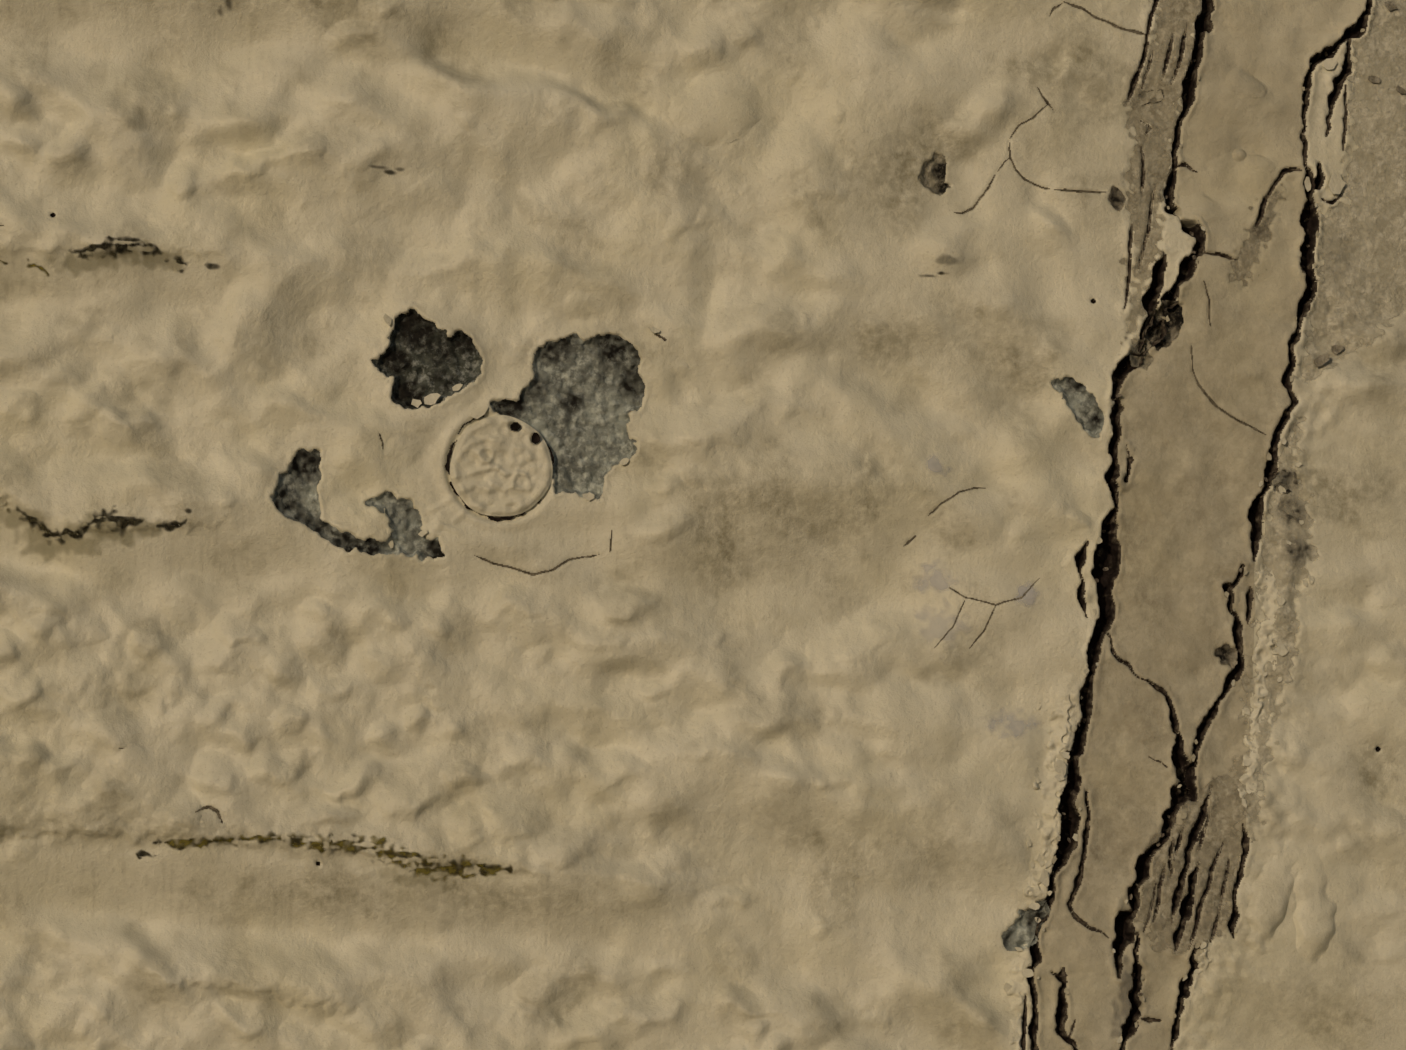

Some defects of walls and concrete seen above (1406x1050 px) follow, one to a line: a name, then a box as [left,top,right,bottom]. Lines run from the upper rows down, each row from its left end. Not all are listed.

spalling [919,152,951,196]
crack [954,87,1106,214]
spalling [371,309,483,409]
spalling [470,333,645,501]
spalling [1051,377,1104,438]
spalling [270,448,445,561]
crack [903,487,986,546]
crack [1021,0,1374,1050]
crack [934,578,1040,649]